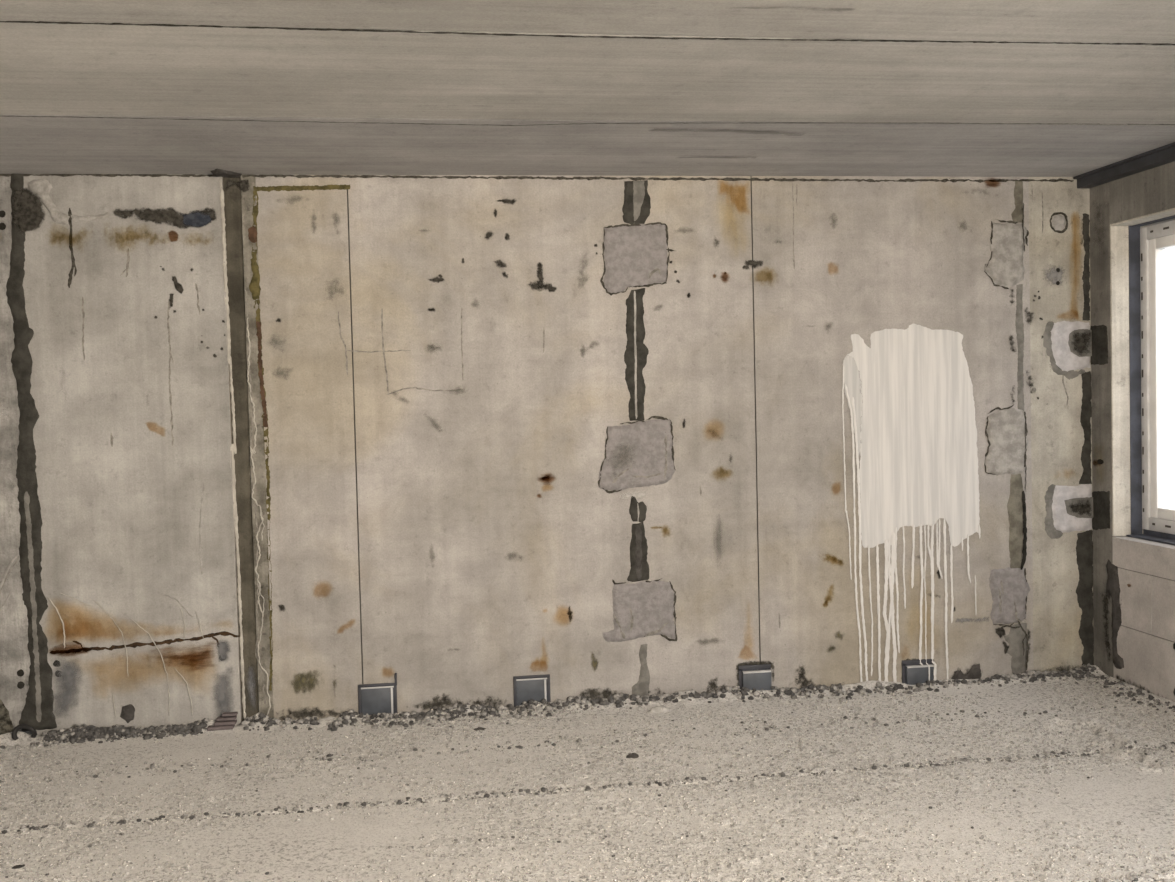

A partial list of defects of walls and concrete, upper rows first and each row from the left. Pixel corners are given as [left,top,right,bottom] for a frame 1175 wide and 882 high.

spalling [183,212,211,227]
crack [49,283,271,715]
rust [51,647,88,655]
rust [172,651,209,662]